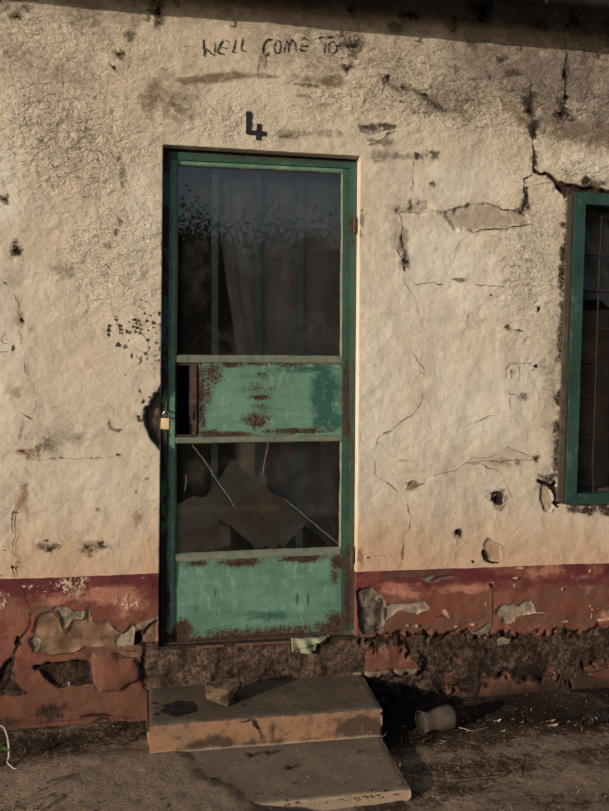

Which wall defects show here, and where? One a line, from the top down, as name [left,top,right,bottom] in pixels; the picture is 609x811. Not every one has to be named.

leakage [337,36,364,75]
crack [518,83,538,216]
crack [396,213,503,289]
leakage [556,213,567,361]
flaking render [137,391,161,448]
leakage [552,375,561,471]
crack [365,447,527,568]
flaking render [535,473,559,513]
leakage [568,505,609,516]
crack [11,466,30,656]
flaking render [0,656,27,696]
flaking render [27,587,609,701]